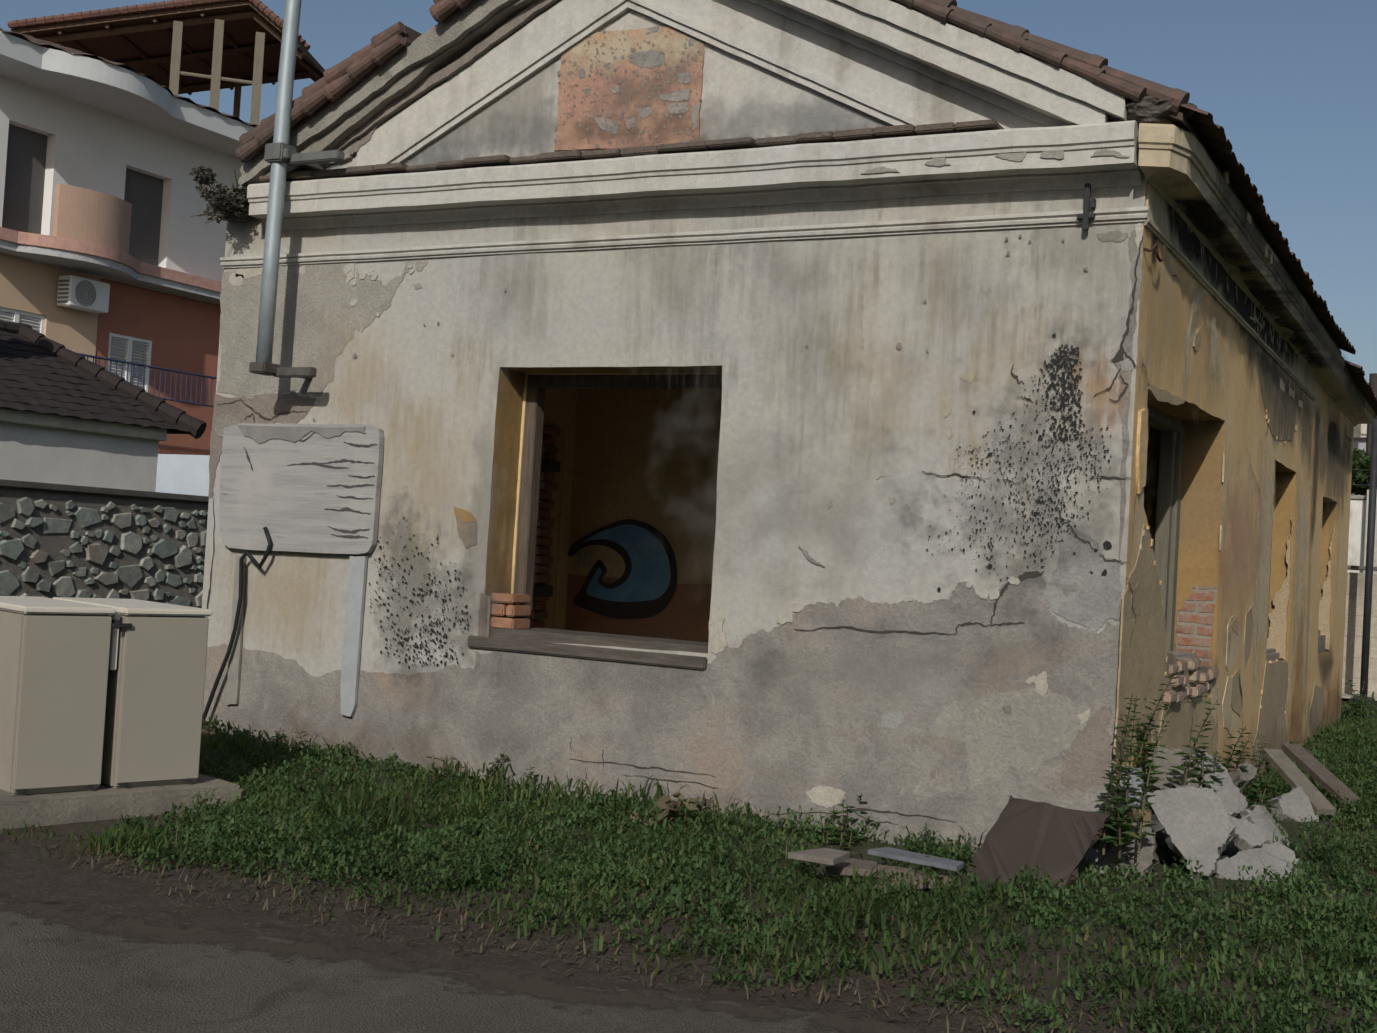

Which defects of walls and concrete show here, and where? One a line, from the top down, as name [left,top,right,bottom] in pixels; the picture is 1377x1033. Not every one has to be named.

flaking render [554,26,705,151]
crack [1093,236,1150,403]
mould [921,333,1112,581]
mould [369,511,471,668]
peeling [203,223,1293,860]
crack [795,570,1045,635]
spalling [1318,526,1336,650]
peeling [1309,685,1340,739]